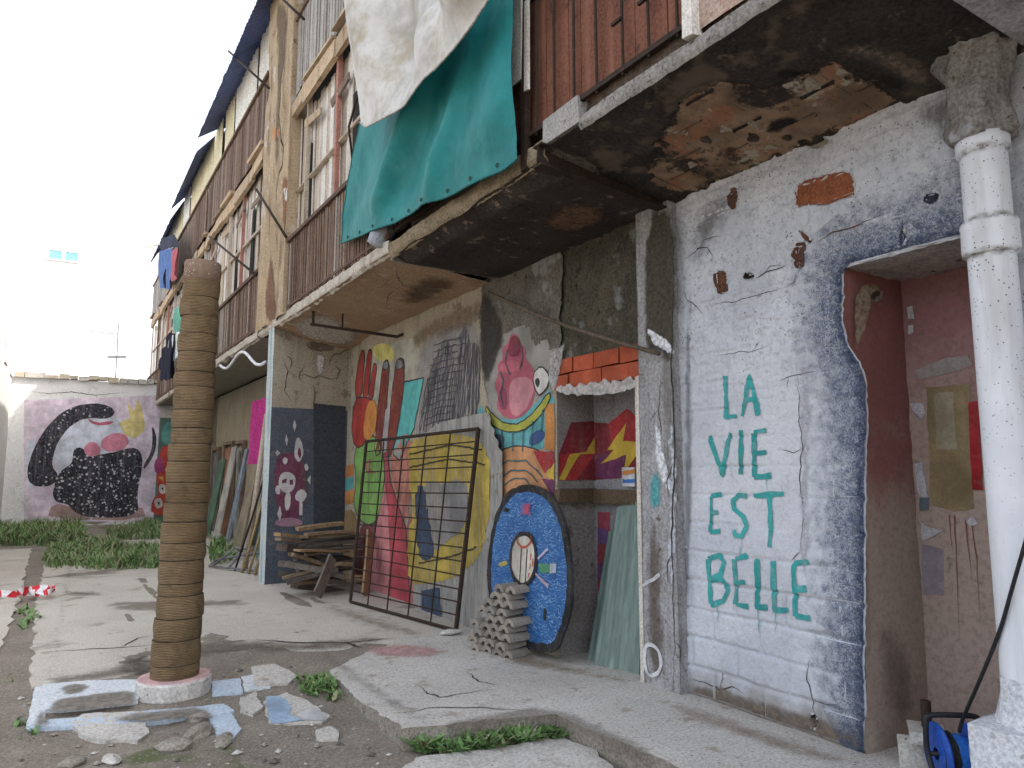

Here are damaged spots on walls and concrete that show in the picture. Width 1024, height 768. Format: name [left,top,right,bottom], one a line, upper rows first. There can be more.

spalling [647,62,898,209]
water stain [767,118,797,133]
spalling [790,229,812,271]
water stain [406,280,451,302]
spalling [713,269,729,295]
crack [652,209,796,694]
crack [780,366,814,578]
crack [404,672,528,713]